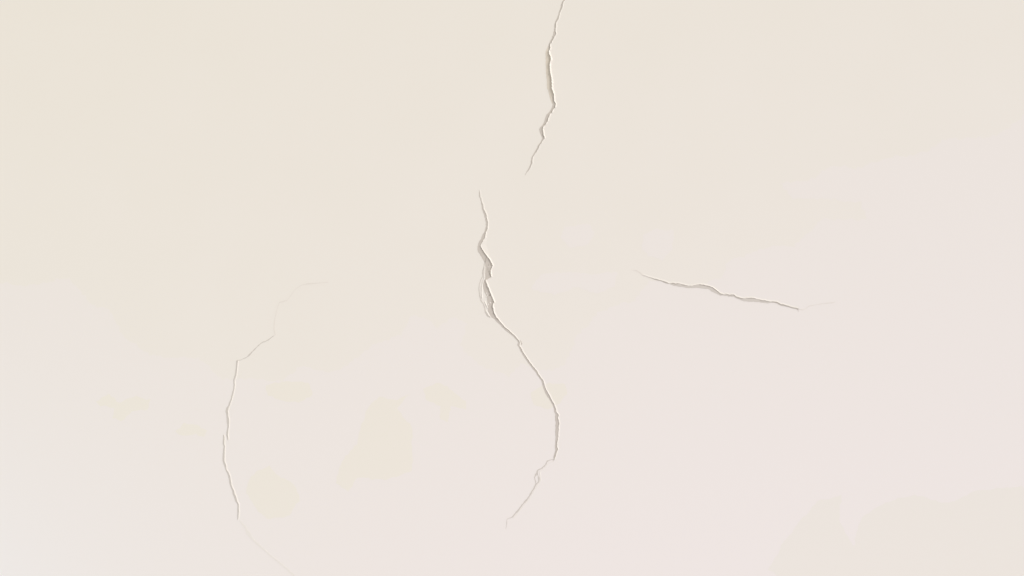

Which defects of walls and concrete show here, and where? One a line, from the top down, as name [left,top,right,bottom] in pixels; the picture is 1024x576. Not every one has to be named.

crack [525,0,566,175]
crack [478,190,561,527]
crack [635,270,834,312]